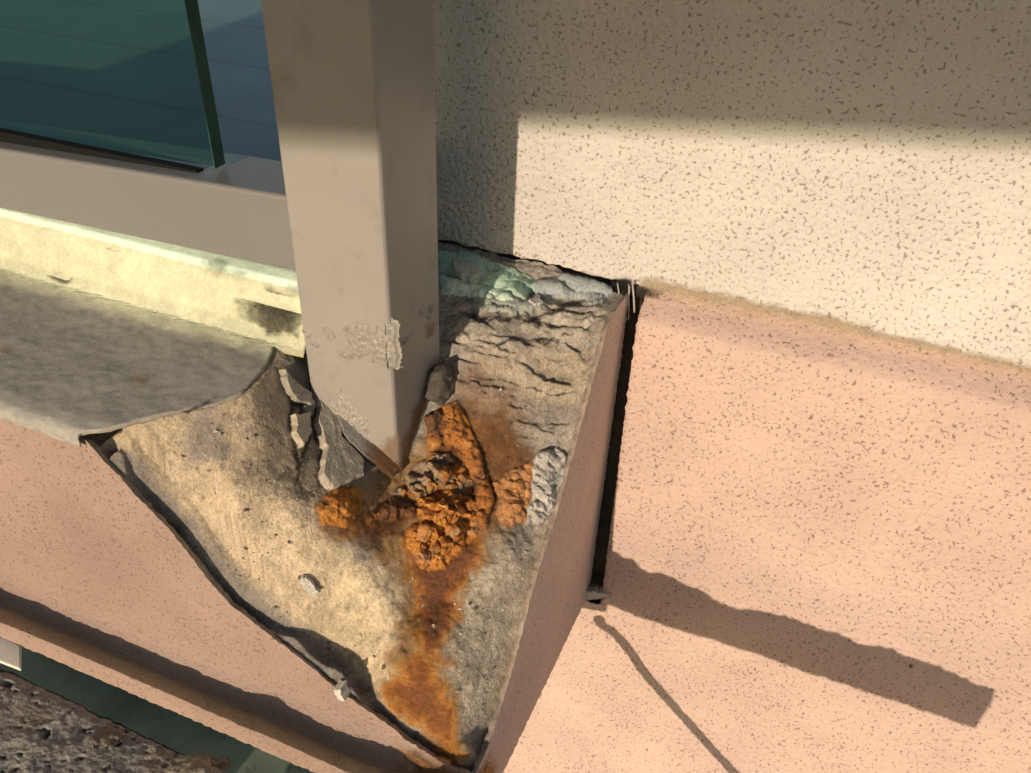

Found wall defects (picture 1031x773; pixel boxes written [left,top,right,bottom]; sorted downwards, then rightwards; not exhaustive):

crack [289,400,323,491]
spalling [82,318,550,773]
corrosion [333,396,530,773]
spalling [399,241,624,477]